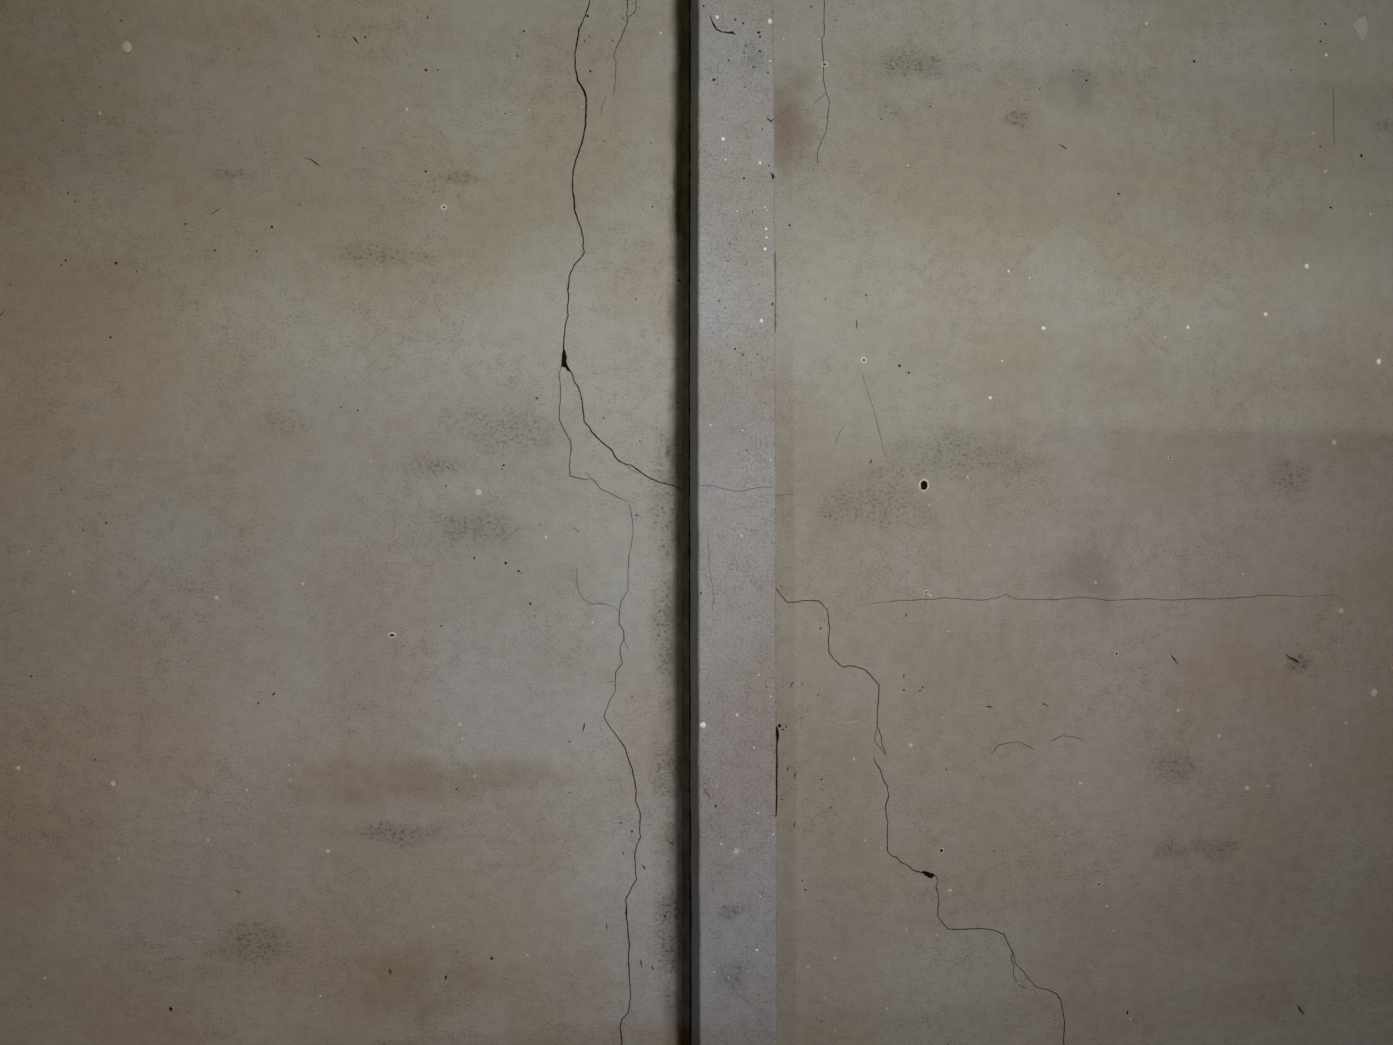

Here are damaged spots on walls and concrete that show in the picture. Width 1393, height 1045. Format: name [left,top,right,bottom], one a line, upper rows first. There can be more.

crack [559,0,795,1045]
crack [776,588,1065,1045]
crack [871,594,1324,604]